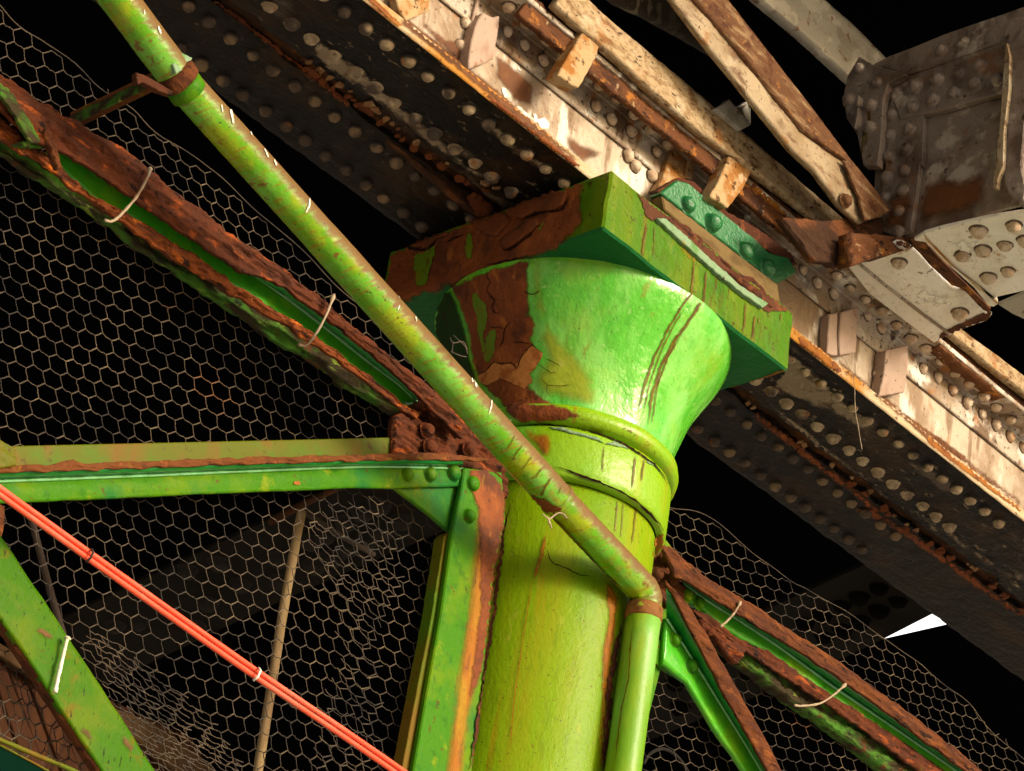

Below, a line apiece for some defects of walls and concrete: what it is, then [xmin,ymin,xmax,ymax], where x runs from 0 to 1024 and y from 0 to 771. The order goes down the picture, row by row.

corrosion [385,137,622,771]
peeling [477,346,543,389]
corrosion [654,534,664,556]
corrosion [755,413,1021,615]